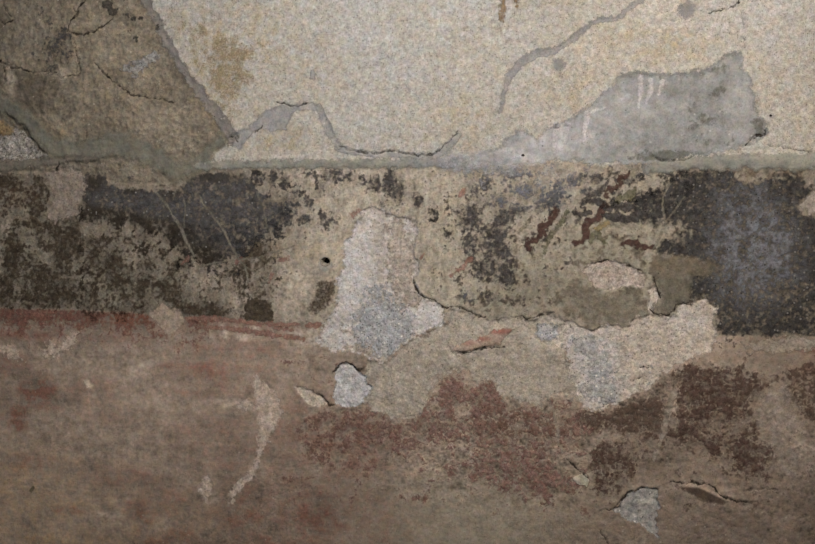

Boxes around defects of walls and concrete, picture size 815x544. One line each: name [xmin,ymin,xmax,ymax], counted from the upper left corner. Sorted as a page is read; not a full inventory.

crack [0,2,173,103]
spalling [0,126,48,161]
flaking render [294,168,719,420]
spalling [606,487,660,538]
crack [670,480,764,503]